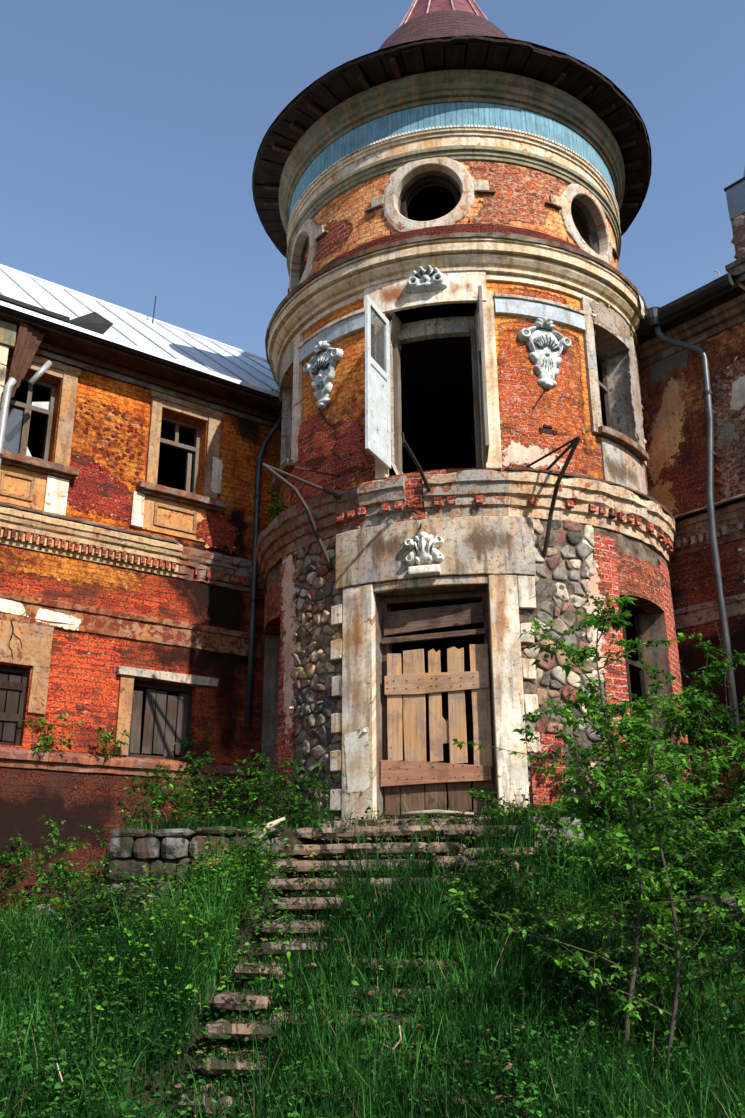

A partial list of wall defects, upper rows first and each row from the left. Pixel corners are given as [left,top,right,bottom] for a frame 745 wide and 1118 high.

spalling [710,356,745,504]
leakage [178,509,248,560]
leakage [169,576,246,632]
leakage [0,791,111,871]